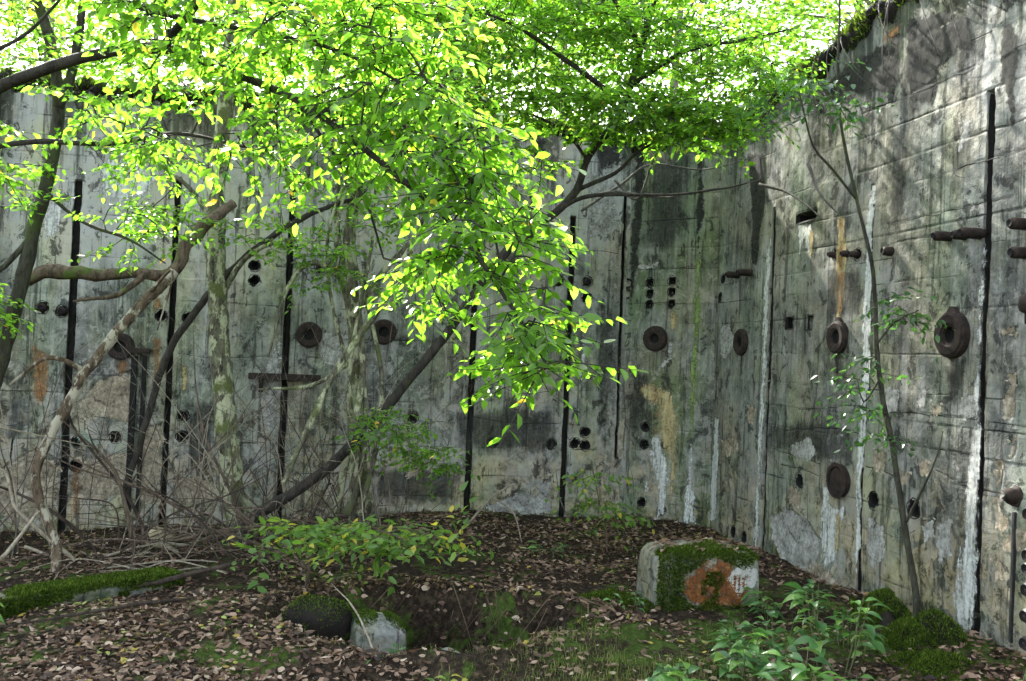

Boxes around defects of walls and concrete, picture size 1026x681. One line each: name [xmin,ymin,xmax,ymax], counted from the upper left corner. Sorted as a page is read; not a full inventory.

leakage [816,11,973,227]
leakage [995,0,1026,127]
corrosion [834,217,847,317]
efflorescence [645,434,668,520]
corrosion [640,383,678,499]
leakage [747,153,771,547]
spalling [769,485,821,571]
leakage [776,185,876,575]